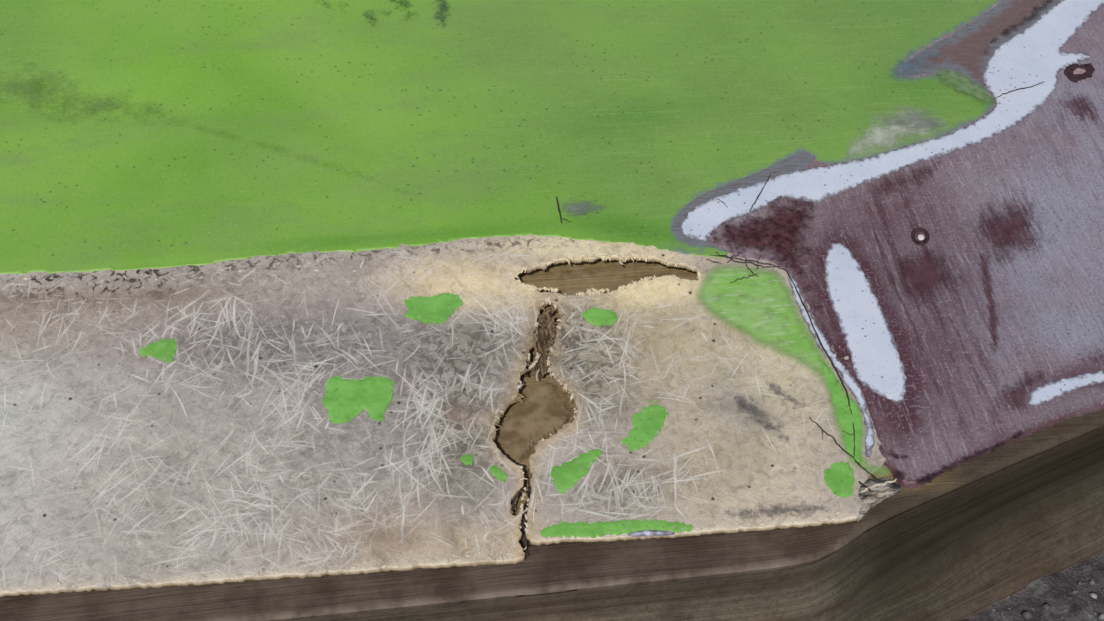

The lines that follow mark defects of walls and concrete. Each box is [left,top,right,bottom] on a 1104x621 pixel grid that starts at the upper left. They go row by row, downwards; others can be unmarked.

damp [1066,98,1095,119]
crack [493,296,577,558]